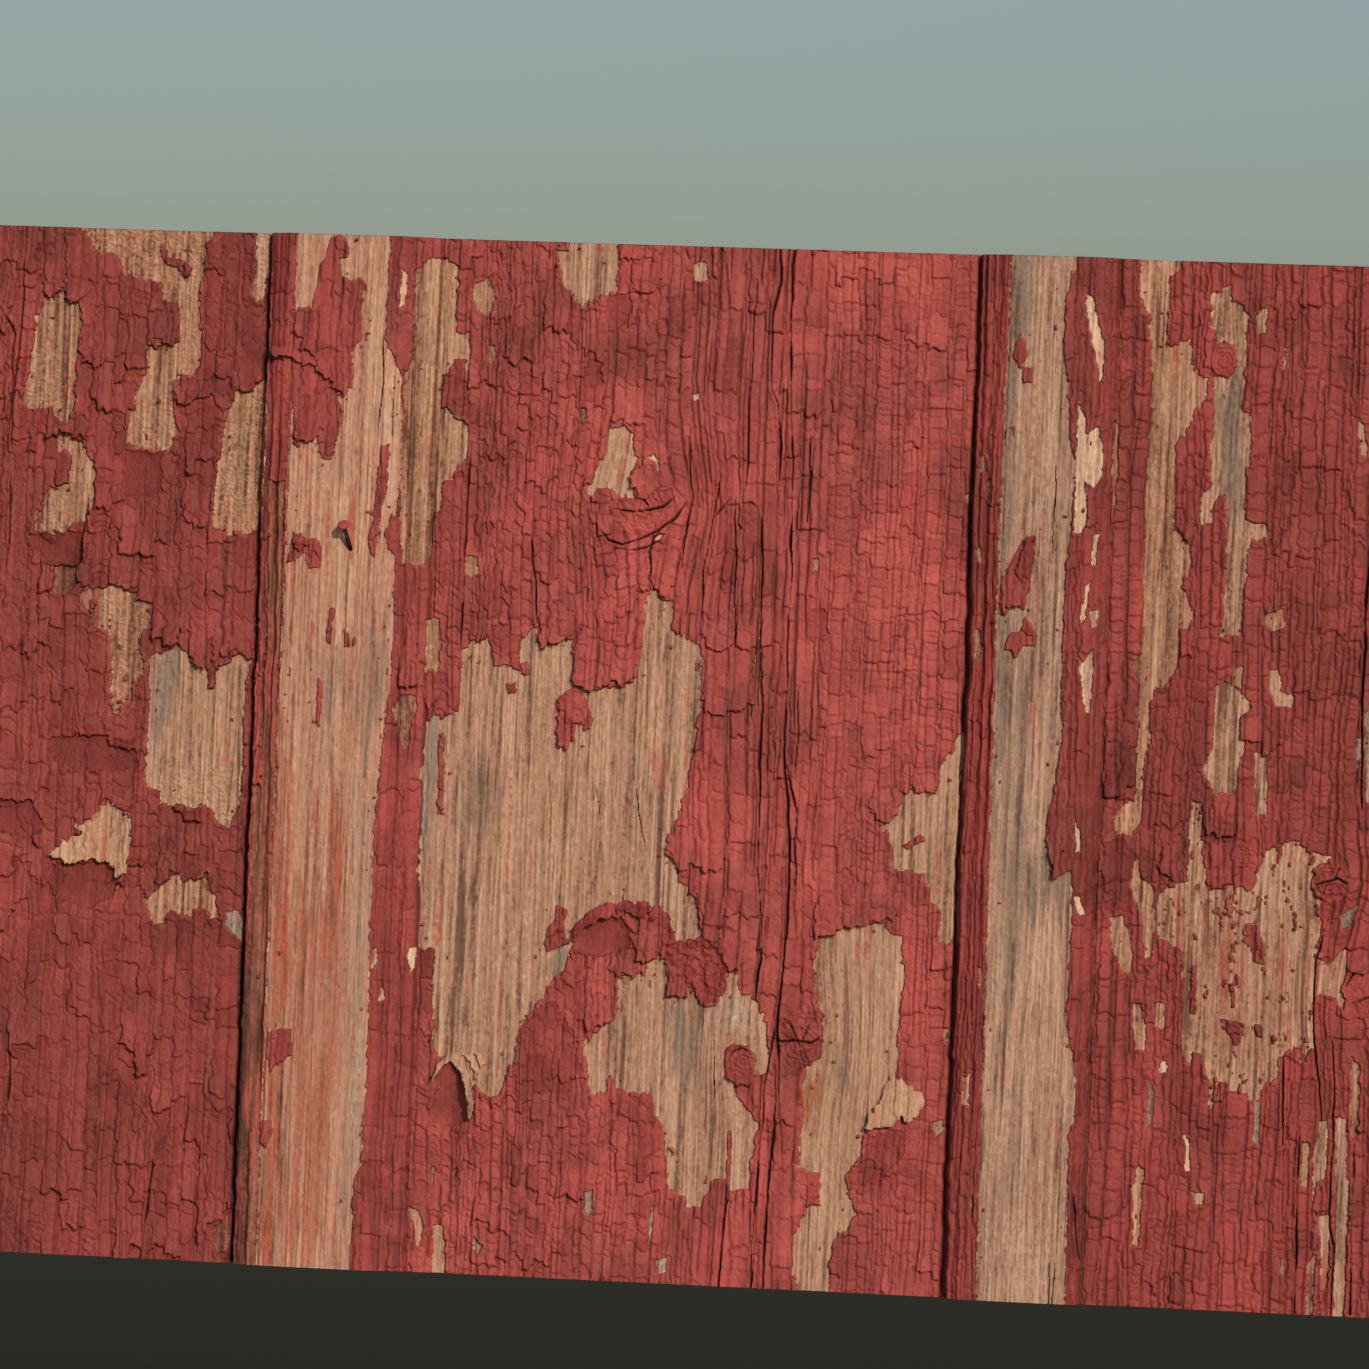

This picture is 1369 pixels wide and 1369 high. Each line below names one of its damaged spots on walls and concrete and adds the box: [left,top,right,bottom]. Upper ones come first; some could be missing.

peeling [23,227,770,1274]
crack [601,249,820,1288]
peeling [792,892,944,1292]
peeling [961,255,1119,1305]
peeling [1131,1167,1145,1245]
peeling [1103,260,1269,836]
peeling [1182,1135,1190,1171]
peeling [1191,1192,1204,1205]
peeling [1109,666,1369,1146]
peeling [1300,1057,1362,1317]
crack [1360,567,1369,810]